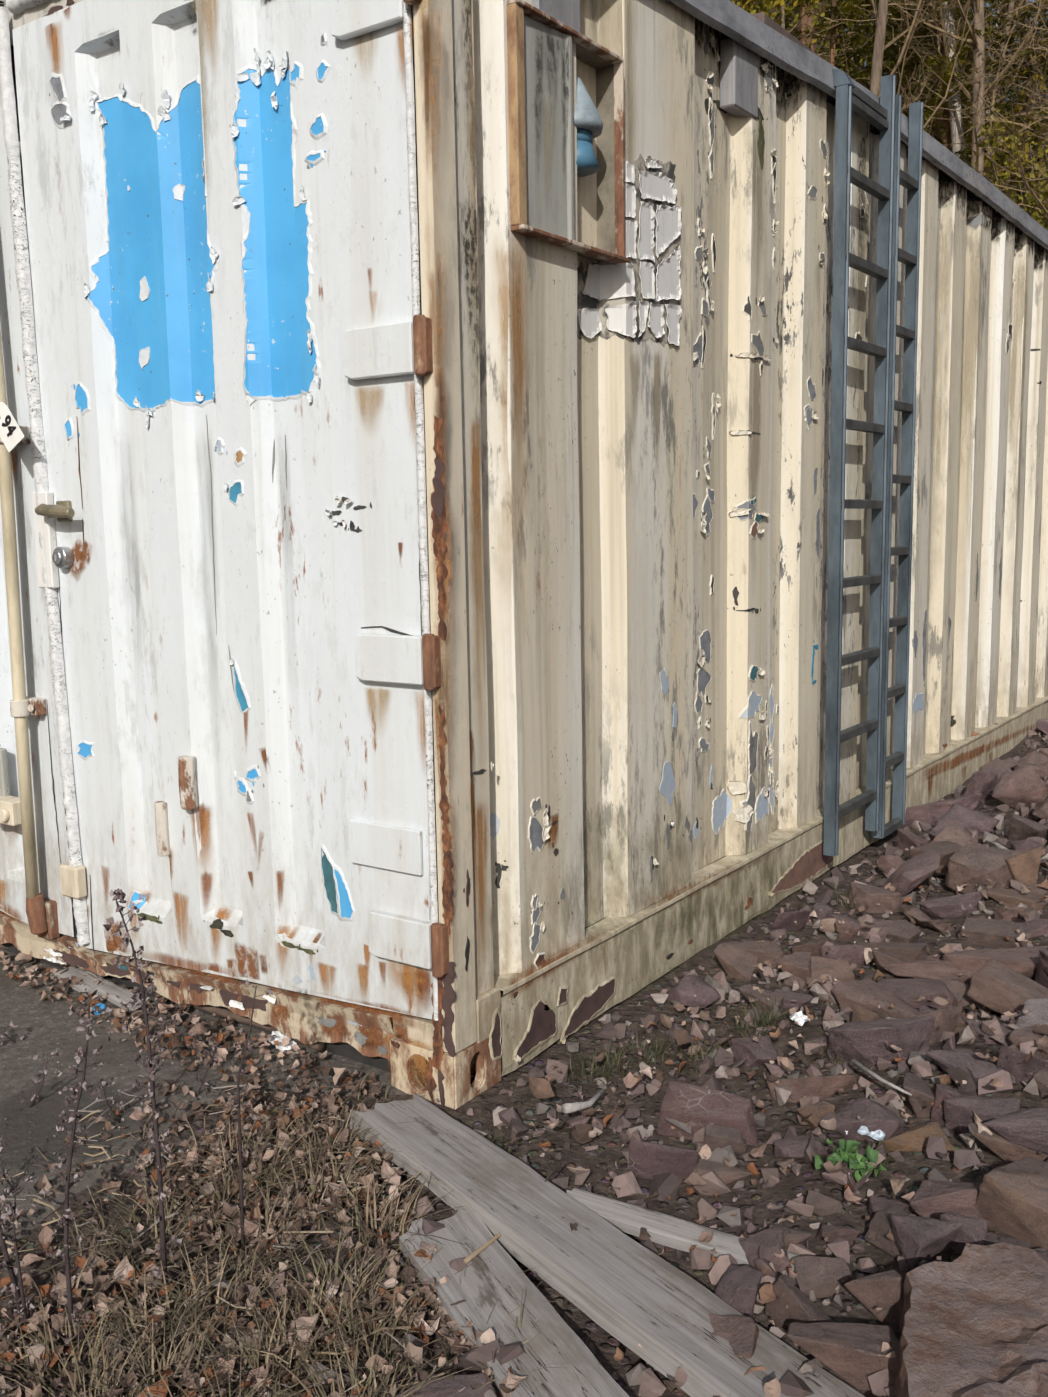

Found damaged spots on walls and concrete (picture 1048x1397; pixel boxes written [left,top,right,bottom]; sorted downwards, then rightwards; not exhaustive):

peeling [49,72,72,129]
rust [398,0,439,126]
peeling [83,74,219,429]
peeling [231,32,331,406]
rust [319,255,492,1107]
peeling [649,629,779,883]
rust [193,807,210,851]
rust [174,894,186,932]
rust [202,875,211,898]
peeling [321,844,355,921]
rust [161,928,294,1017]
peeling [488,976,617,1065]